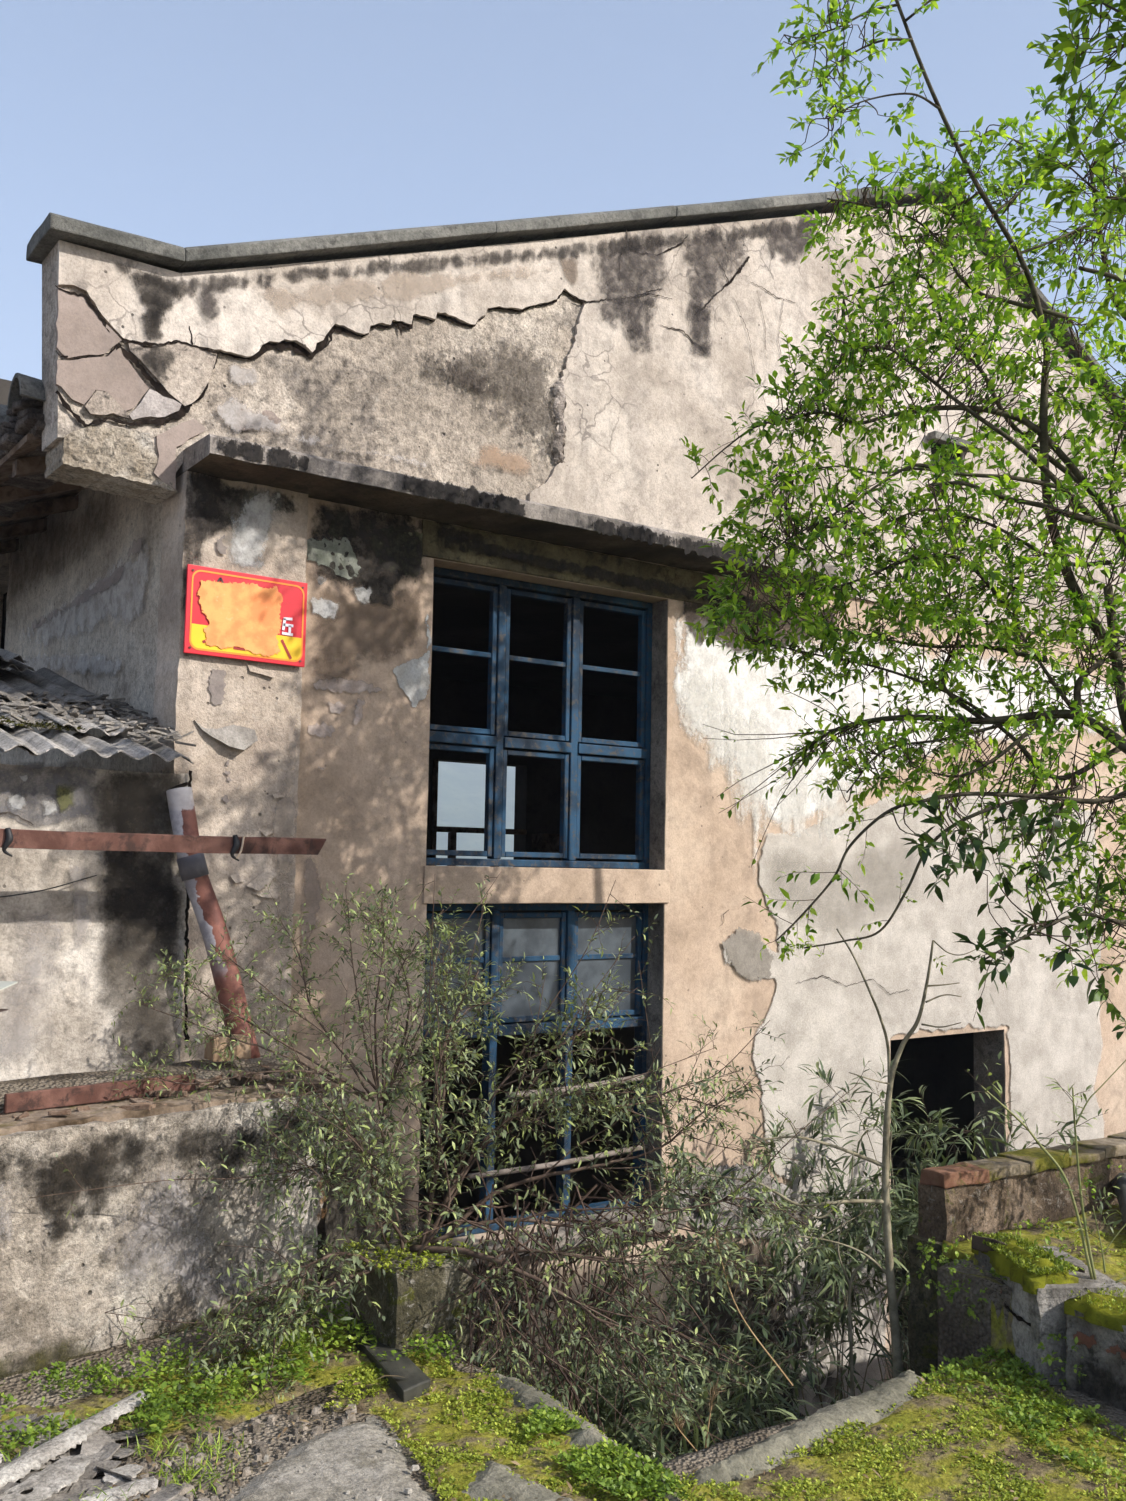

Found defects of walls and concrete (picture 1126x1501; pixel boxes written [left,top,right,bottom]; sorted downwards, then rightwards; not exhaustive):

flaking render [55,287,217,490]
flaking render [194,720,258,750]
leakage [182,472,297,609]
peeling [308,614,432,738]
crack [55,230,796,427]
leakage [372,452,526,517]
leakage [117,216,817,383]
flaking render [420,339,567,464]
leakage [307,505,836,680]
peeling [674,619,1121,852]
leakage [0,762,181,1069]
leakage [0,1114,318,1239]